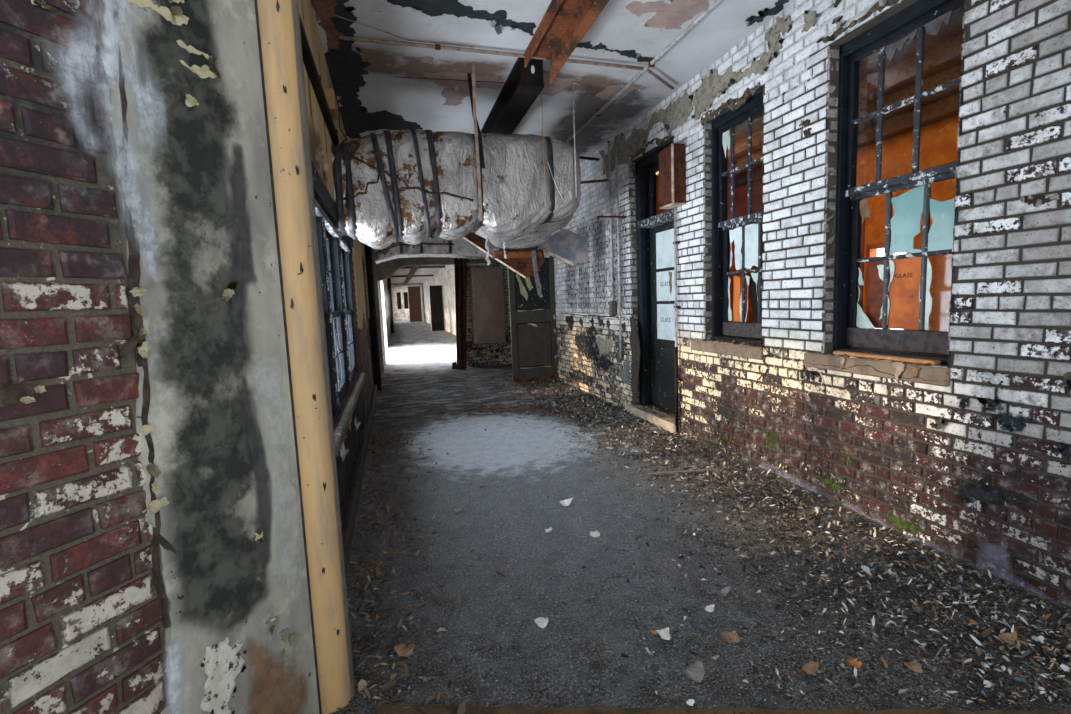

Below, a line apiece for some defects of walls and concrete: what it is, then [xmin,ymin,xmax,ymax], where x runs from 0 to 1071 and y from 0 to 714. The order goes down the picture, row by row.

peeling [419,57,504,106]
flaking render [596,0,901,178]
damp [66,0,299,628]
peeling [800,369,819,381]
peeling [893,362,905,382]
peeling [956,396,1032,432]
peeling [1049,443,1071,457]
flaking render [199,637,247,714]